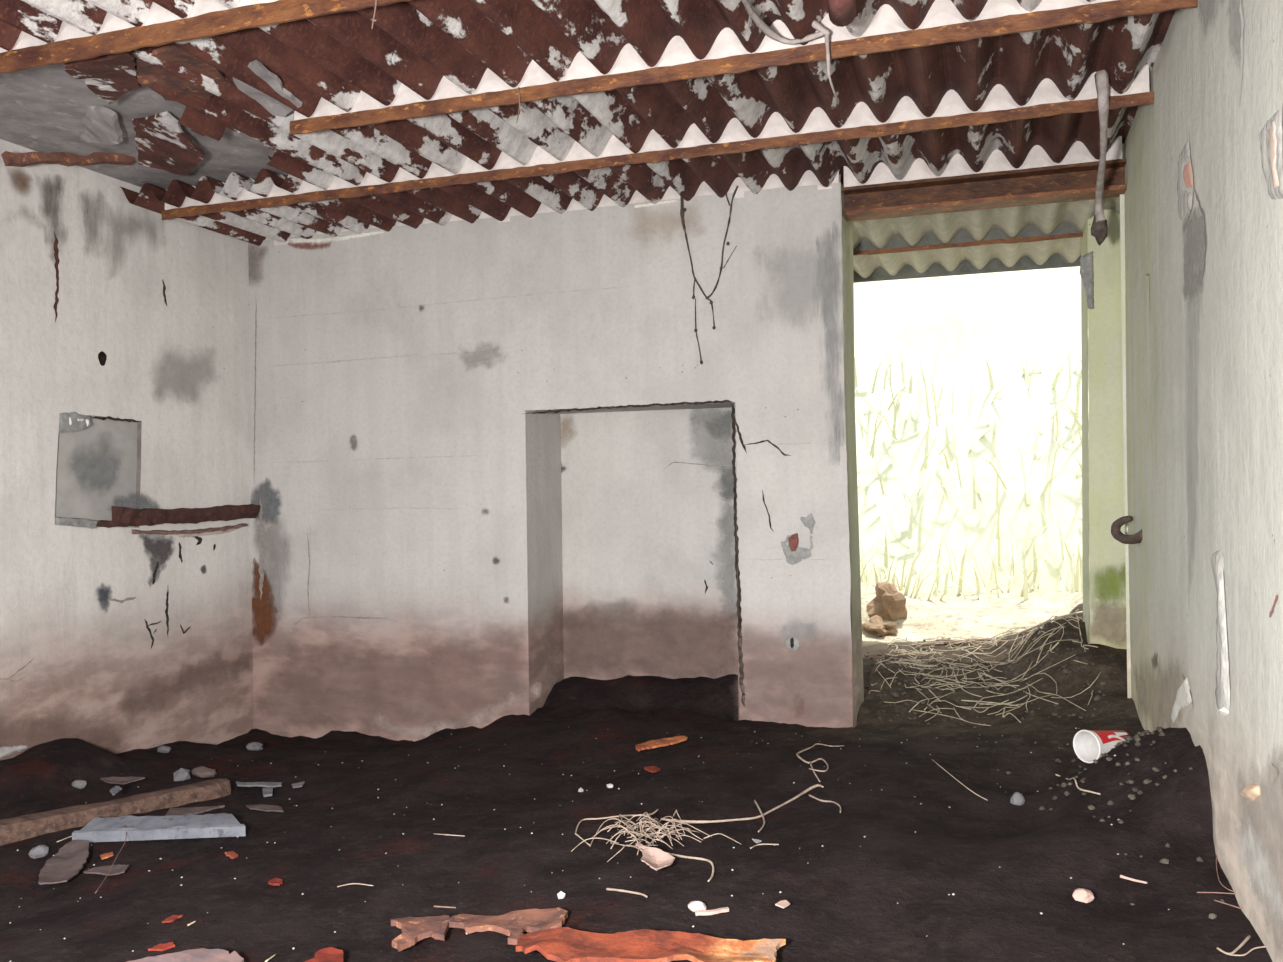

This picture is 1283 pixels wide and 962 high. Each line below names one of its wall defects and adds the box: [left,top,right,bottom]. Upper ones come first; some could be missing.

corrosion [1,44,303,190]
peeling [1259,103,1283,200]
water stain [44,180,60,235]
crack [52,233,60,322]
crack [525,400,791,707]
water stain [563,409,762,679]
spalling [780,513,816,565]
water stain [98,587,136,608]
crack [144,590,191,648]
corrosion [252,561,276,644]
water stain [124,657,249,714]
water stain [0,723,119,760]